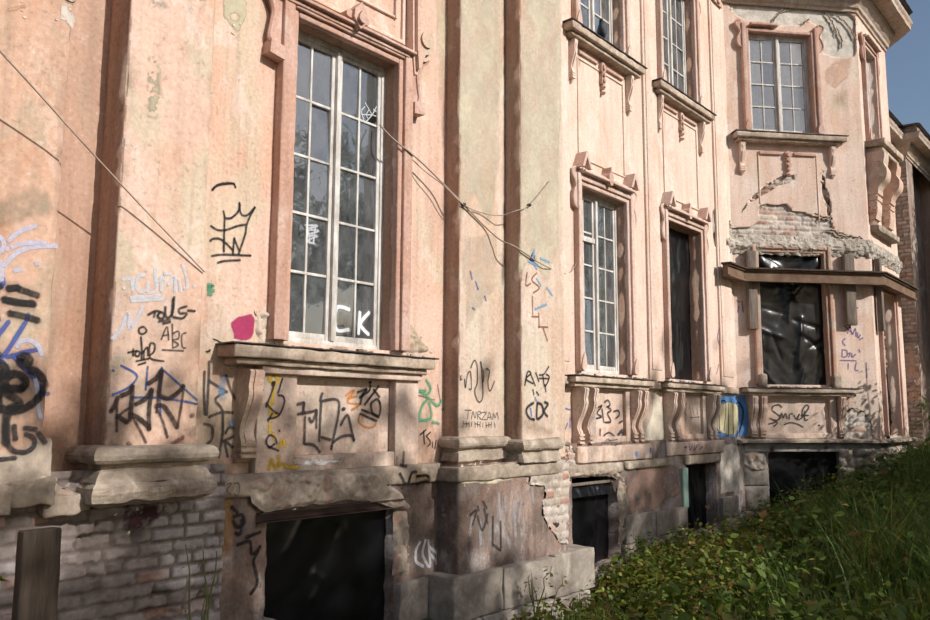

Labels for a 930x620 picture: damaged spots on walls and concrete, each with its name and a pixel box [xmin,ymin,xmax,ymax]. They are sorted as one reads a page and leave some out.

peeling [56,5,77,27]
peeling [223,0,247,35]
spalling [728,3,859,88]
spalling [729,174,847,239]
peeling [461,478,513,486]
spalling [527,441,679,544]